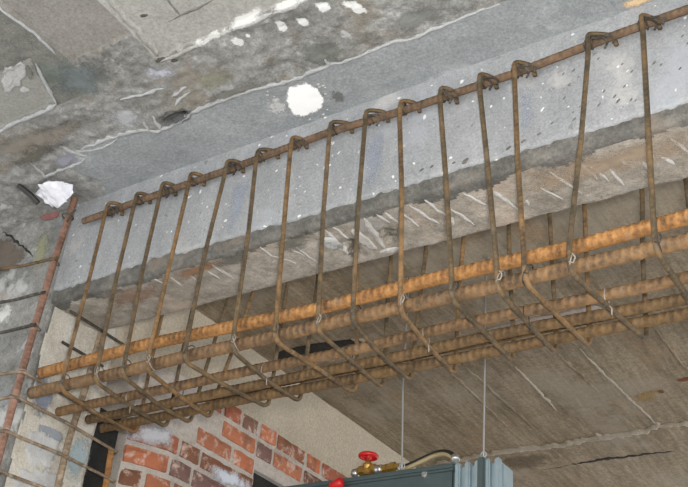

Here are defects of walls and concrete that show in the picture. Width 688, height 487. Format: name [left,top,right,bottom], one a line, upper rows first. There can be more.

crack [30,0,500,178]
spalling [324,228,399,255]
peeling [487,305,602,331]
spalling [0,196,124,487]
spalling [273,338,365,359]
crack [432,421,688,466]